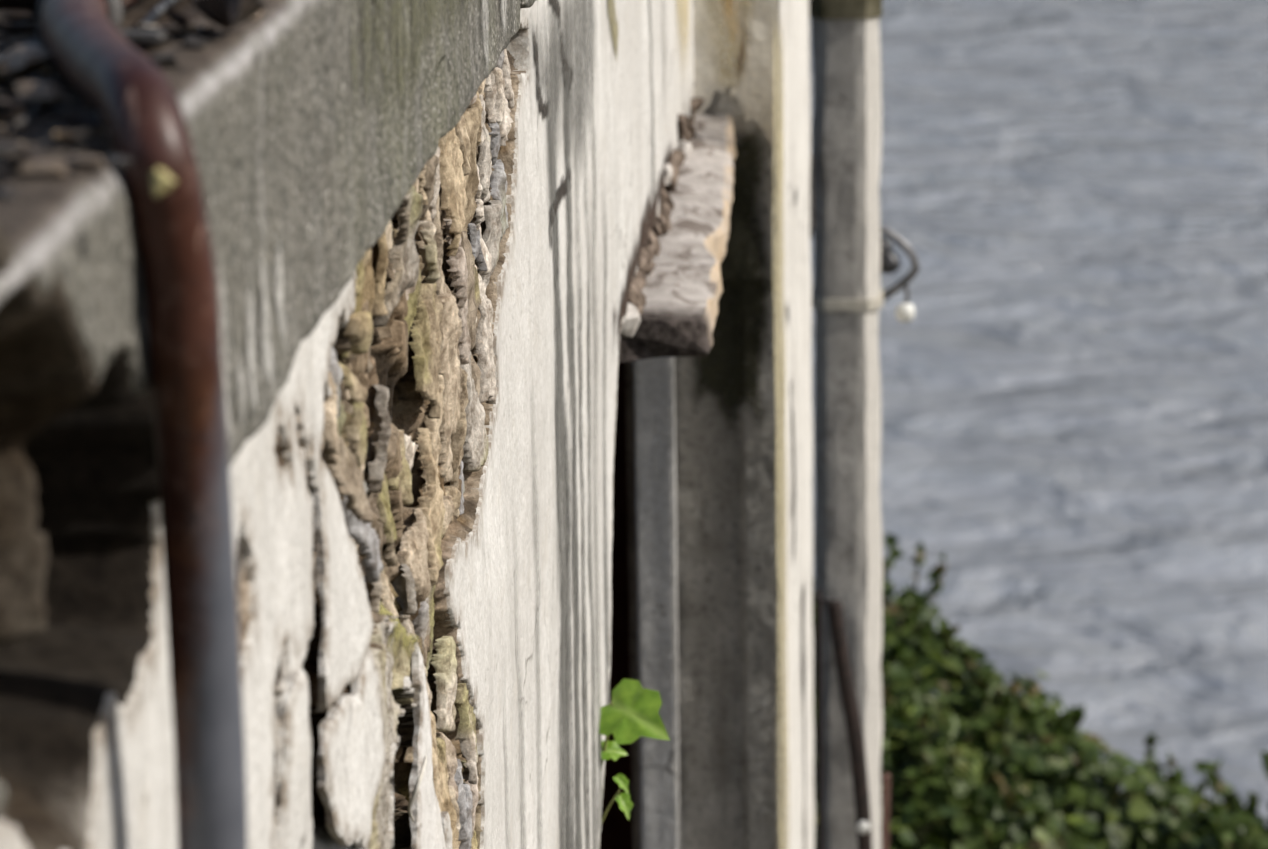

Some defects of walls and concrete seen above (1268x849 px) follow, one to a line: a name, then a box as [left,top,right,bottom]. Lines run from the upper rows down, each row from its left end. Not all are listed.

peeling [236,532,251,663]
spalling [274,49,521,849]
leakage [538,0,618,849]
spalling [614,83,704,350]